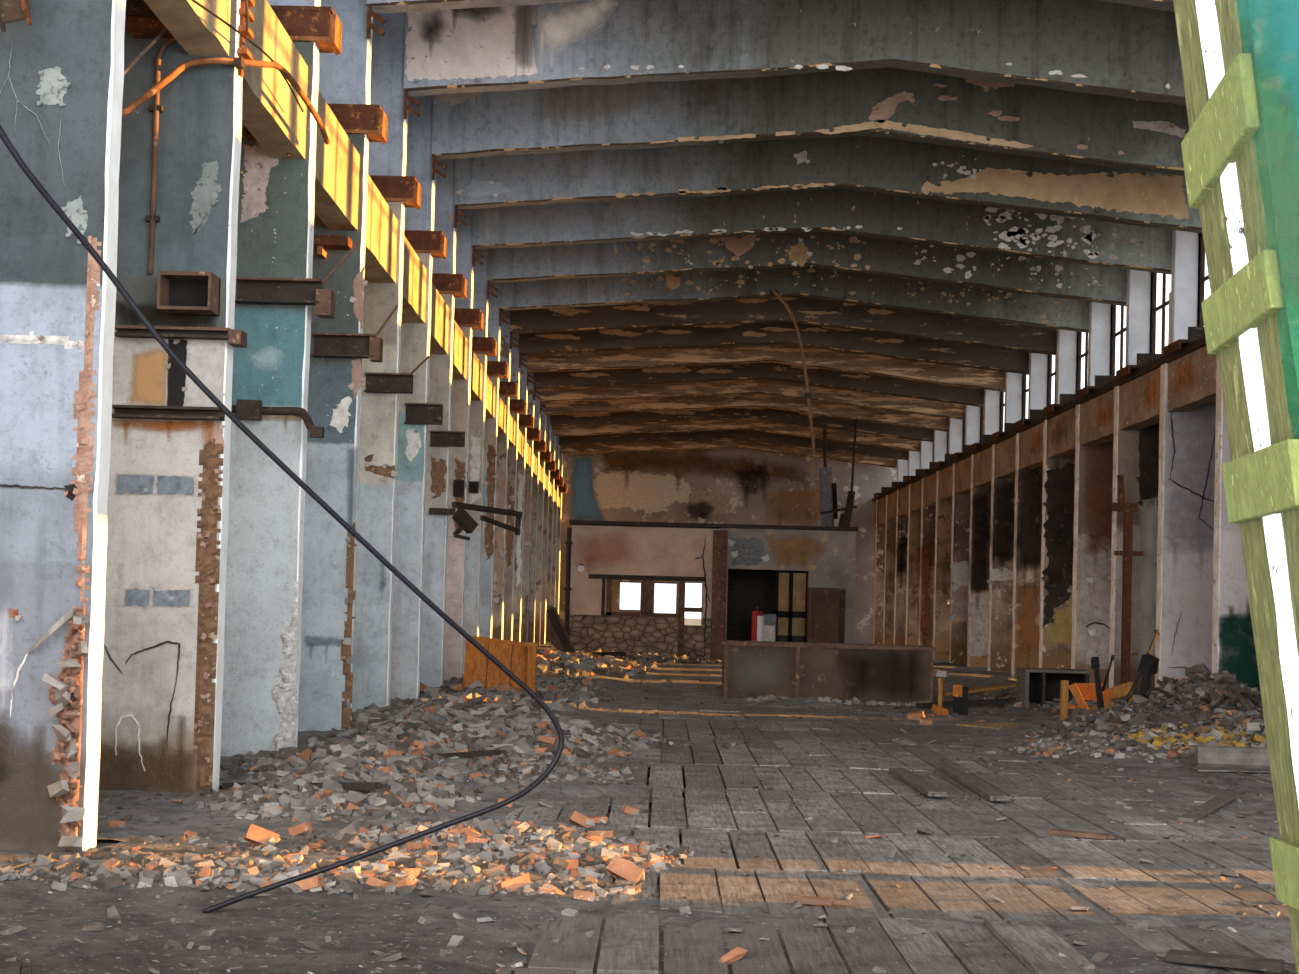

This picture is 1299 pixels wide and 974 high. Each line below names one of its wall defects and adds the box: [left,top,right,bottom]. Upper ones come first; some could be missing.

peeling [36,66,71,107]
peeling [189,161,222,235]
peeling [238,142,279,228]
peeling [776,90,1189,323]
peeling [613,225,895,337]
spalling [0,196,101,847]
spalling [193,420,225,791]
damp [0,730,59,847]